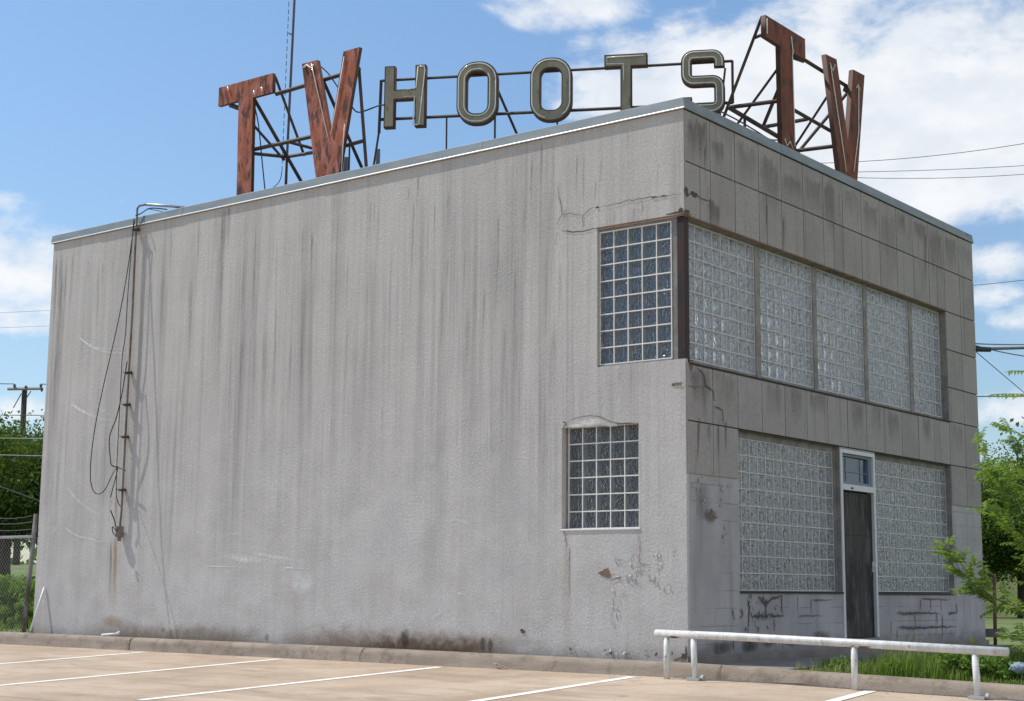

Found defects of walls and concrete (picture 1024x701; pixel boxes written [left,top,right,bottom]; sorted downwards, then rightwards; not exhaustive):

crack [555,186,678,244]
crack [688,368,724,424]
peeling [598,551,671,634]